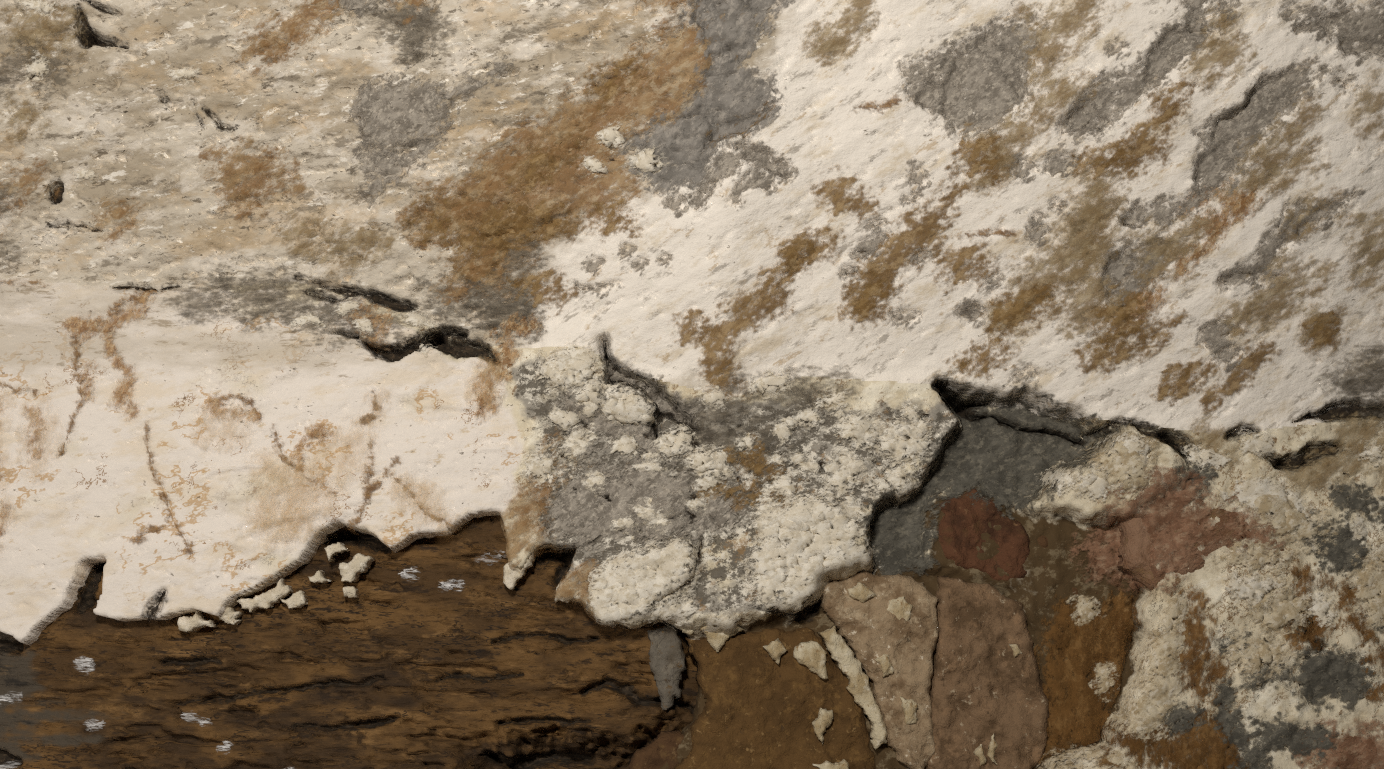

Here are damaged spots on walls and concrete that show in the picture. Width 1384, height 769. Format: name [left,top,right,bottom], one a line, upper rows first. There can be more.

water stain [237,0,340,74]
water stain [199,139,304,221]
water stain [277,0,725,315]
crack [107,282,180,316]
crack [217,272,500,536]
crack [599,335,697,438]
water stain [673,0,1384,769]
crack [129,424,193,553]
peeling [521,342,1159,652]
peeling [177,542,376,632]
peeling [1036,429,1384,769]
peeling [763,626,887,750]